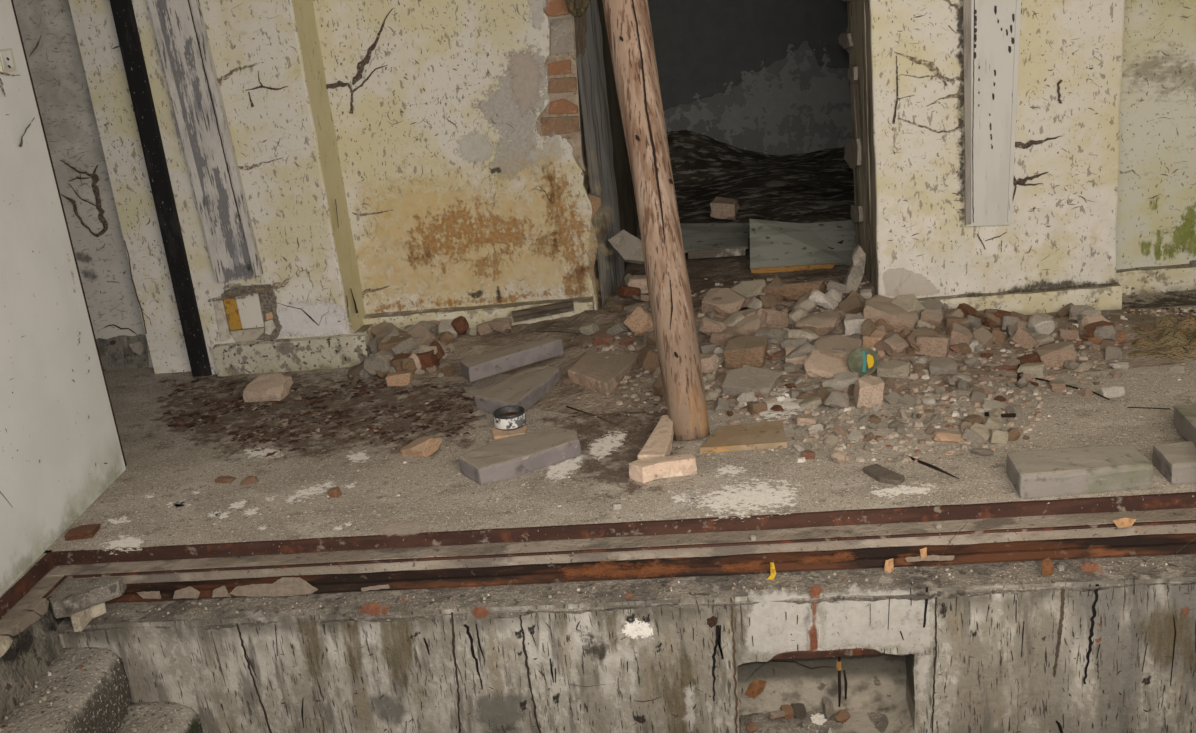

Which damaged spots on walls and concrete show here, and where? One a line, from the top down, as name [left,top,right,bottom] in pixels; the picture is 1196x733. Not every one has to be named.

peeling [457,0,586,185]
spalling [154,0,350,342]
leakage [361,163,589,312]
spalling [588,193,601,219]
crack [211,623,272,733]
crack [519,610,541,733]
spalling [0,562,1196,733]
rust [560,559,686,578]
rust [720,561,760,572]
rust [809,586,822,652]